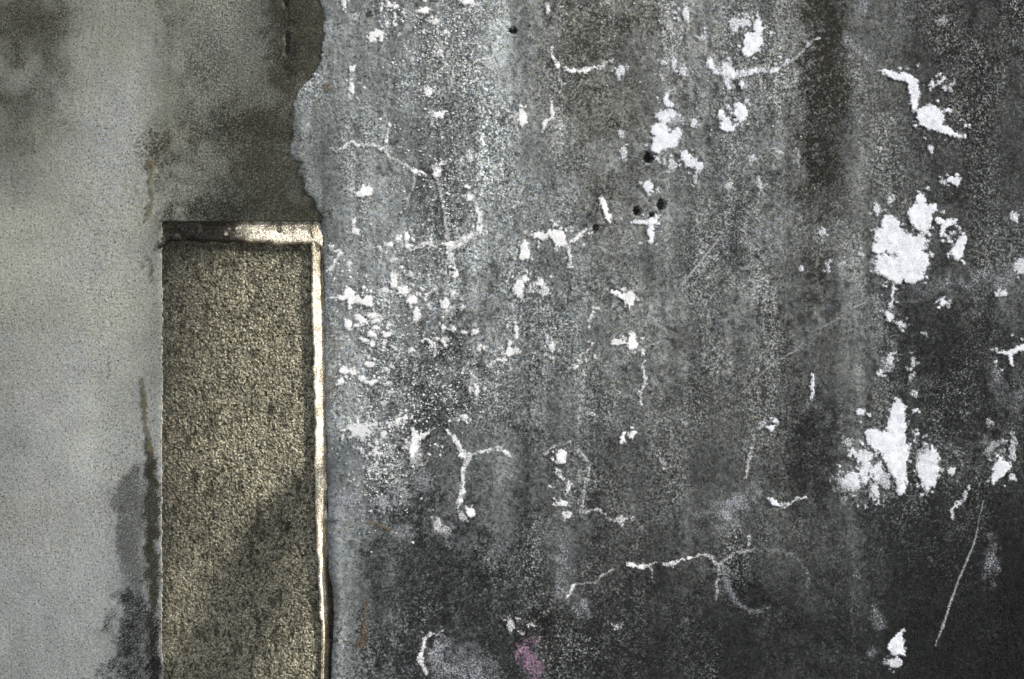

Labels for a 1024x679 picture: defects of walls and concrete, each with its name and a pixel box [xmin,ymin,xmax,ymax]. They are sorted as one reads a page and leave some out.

water stain [0,0,77,68]
water stain [136,0,332,234]
water stain [95,438,166,679]
water stain [397,308,487,477]
crack [446,429,511,508]
crack [566,535,750,598]
water stain [347,380,1024,679]
water stain [863,264,1024,447]
crack [950,485,970,518]